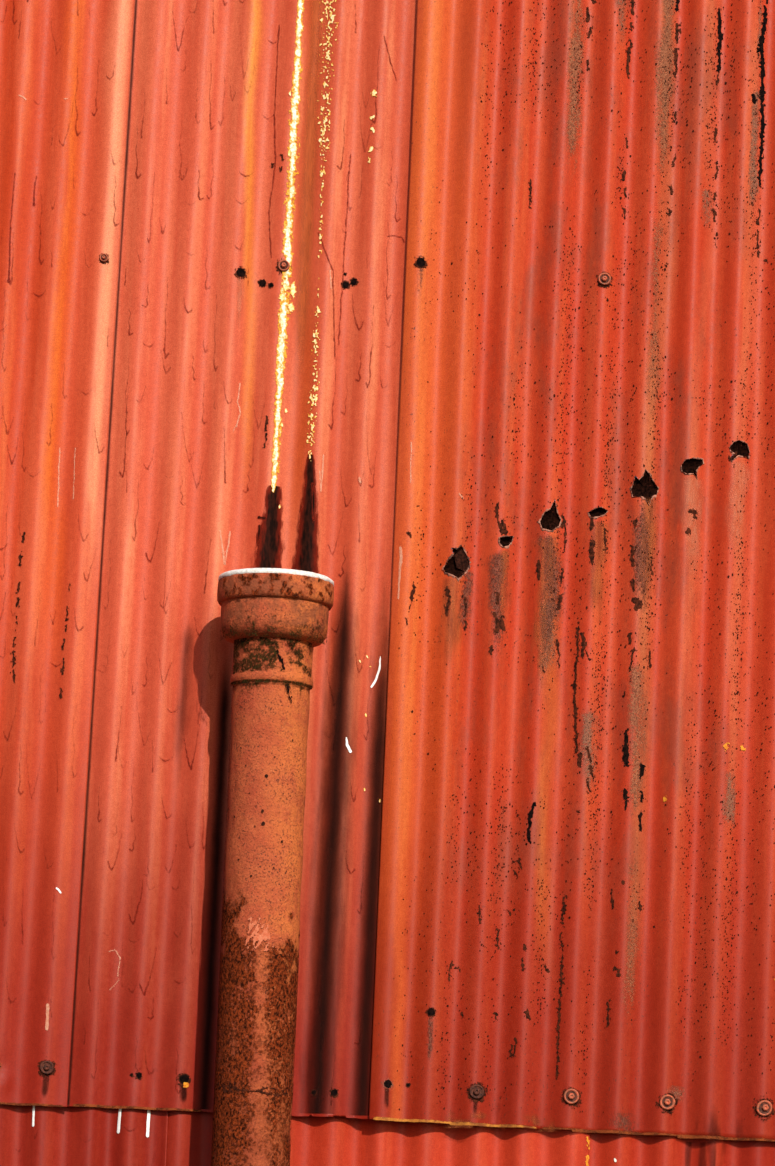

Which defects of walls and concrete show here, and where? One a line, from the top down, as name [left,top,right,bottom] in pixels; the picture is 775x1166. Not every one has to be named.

peeling [567,0,597,153]
peeling [616,0,634,78]
peeling [656,0,682,168]
corrosion [223,454,333,602]
corrosion [374,959,775,1141]